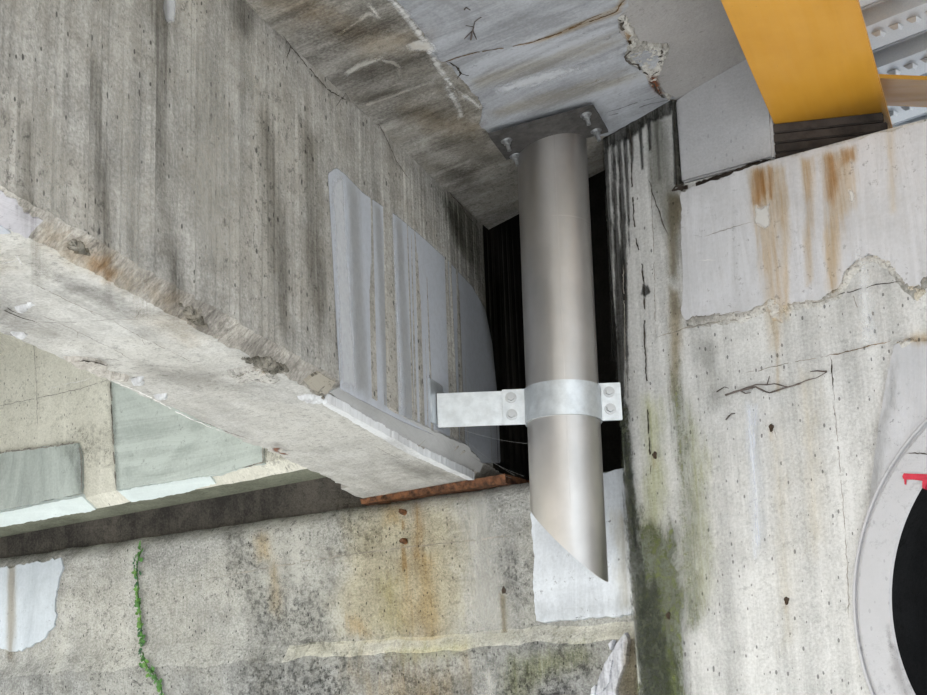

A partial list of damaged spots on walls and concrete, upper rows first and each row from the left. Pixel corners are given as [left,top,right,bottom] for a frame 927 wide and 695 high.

crack [442,0,625,79]
spalling [617,15,676,101]
rust [755,206,769,228]
peeling [658,255,927,337]
leakage [603,99,678,695]
leakage [673,385,699,625]
crack [749,341,890,619]
peeling [590,632,631,695]